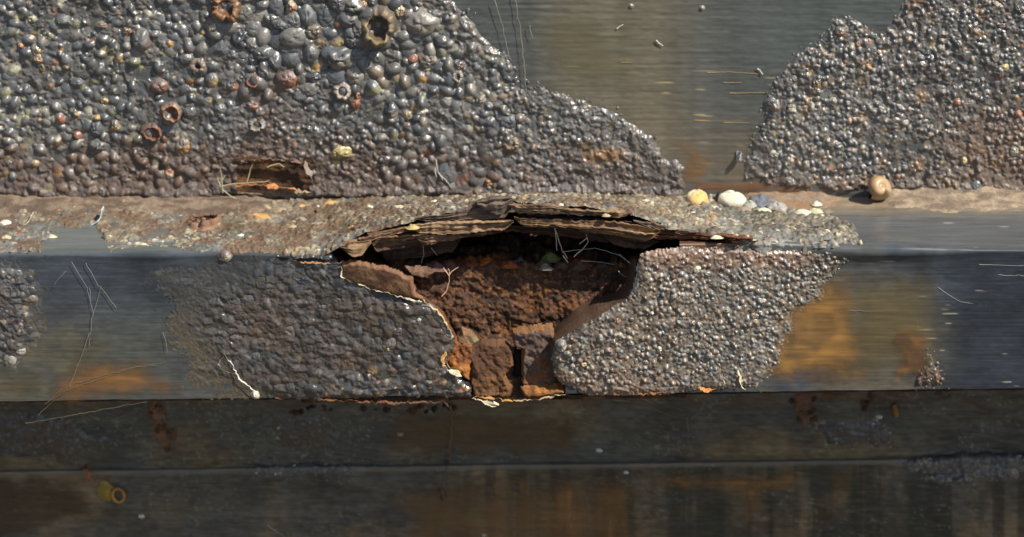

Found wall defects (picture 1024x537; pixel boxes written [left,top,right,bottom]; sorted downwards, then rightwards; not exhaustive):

spalling [301,212,688,408]
rust [775,289,922,372]